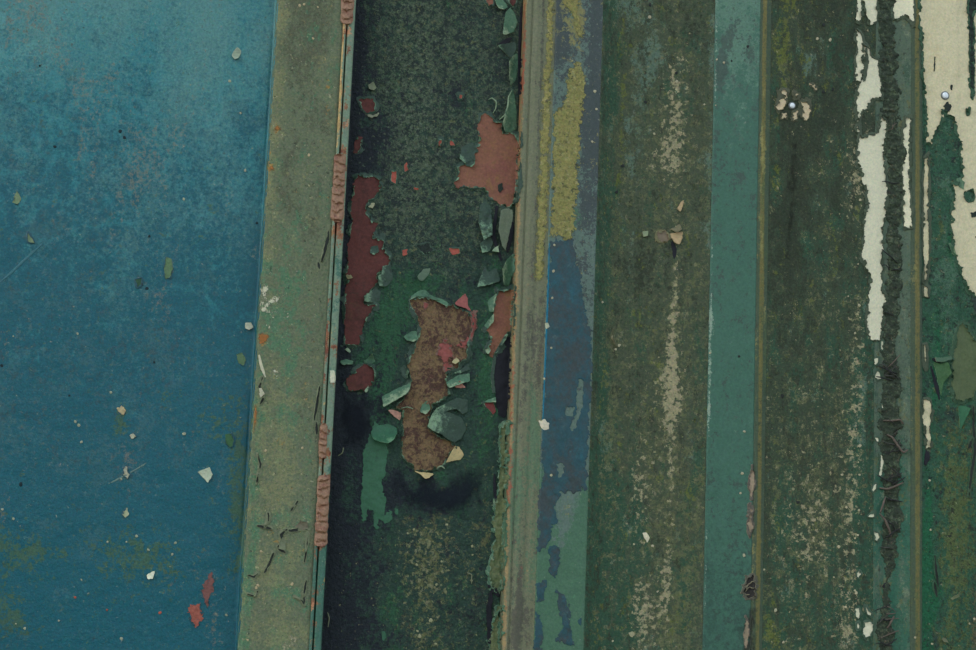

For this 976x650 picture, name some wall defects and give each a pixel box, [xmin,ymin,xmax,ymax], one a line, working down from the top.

peeling [356,82,380,118]
peeling [330,163,436,395]
peeling [371,0,523,650]
peeling [774,82,818,122]
peeling [853,0,976,382]
peeling [920,319,976,452]